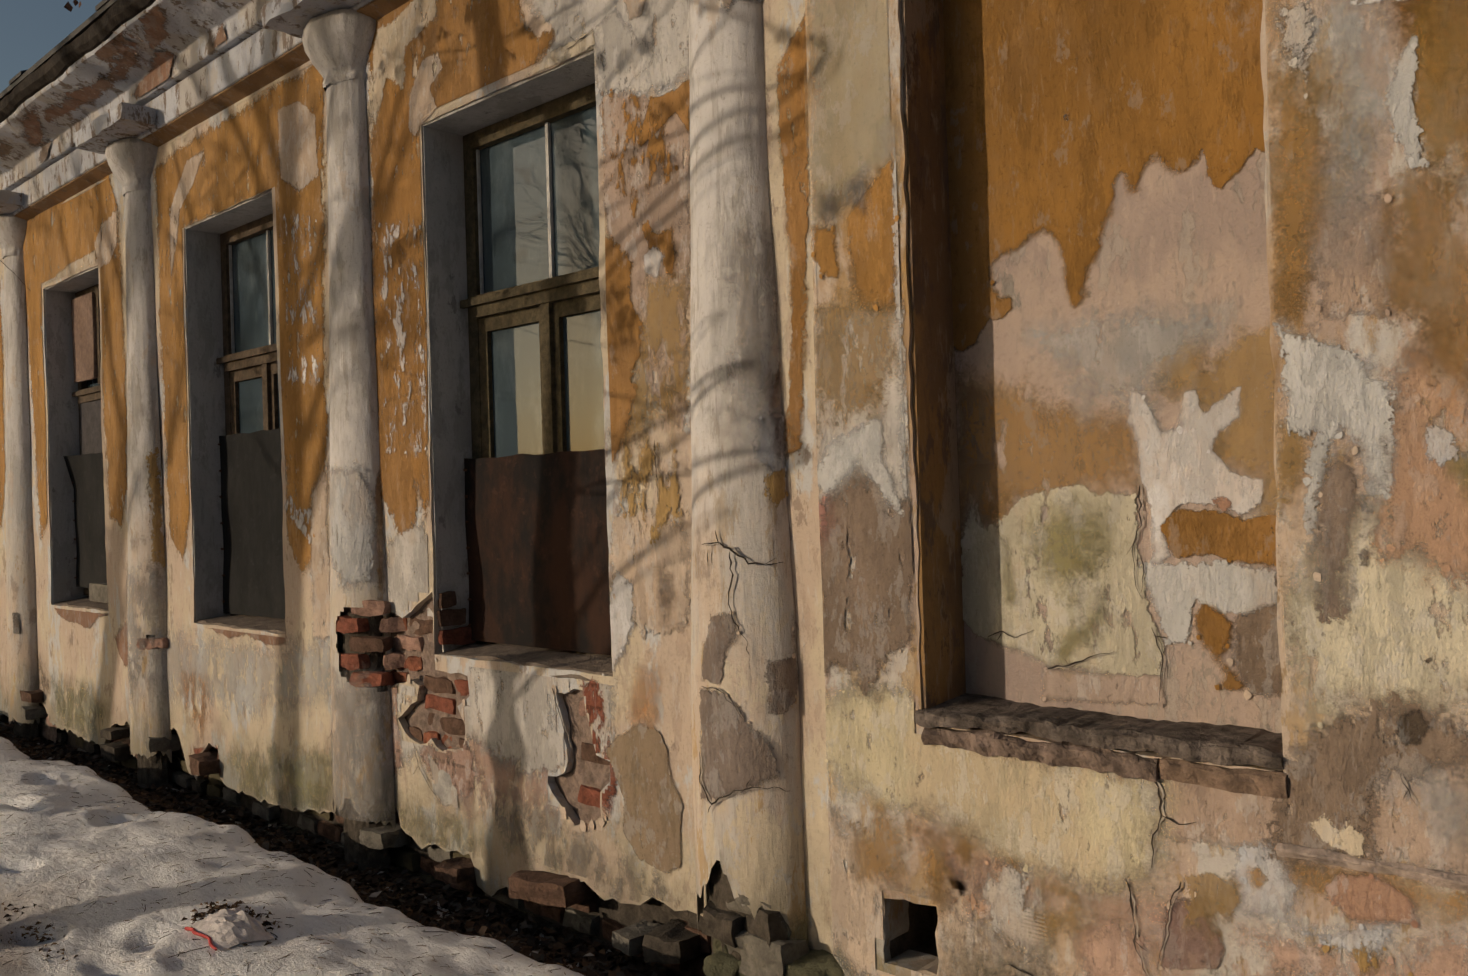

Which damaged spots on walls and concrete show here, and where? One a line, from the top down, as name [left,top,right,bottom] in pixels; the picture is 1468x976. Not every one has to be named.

flaking render [0,2,174,163]
damp [1266,1,1323,314]
damp [1383,0,1468,370]
peeling [23,175,127,538]
peeling [115,0,691,873]
crack [702,531,784,668]
damp [1035,512,1105,579]
peeling [755,0,1468,976]
damp [237,750,333,807]
crack [702,686,744,719]
peeling [699,611,779,802]
crack [1125,771,1195,976]